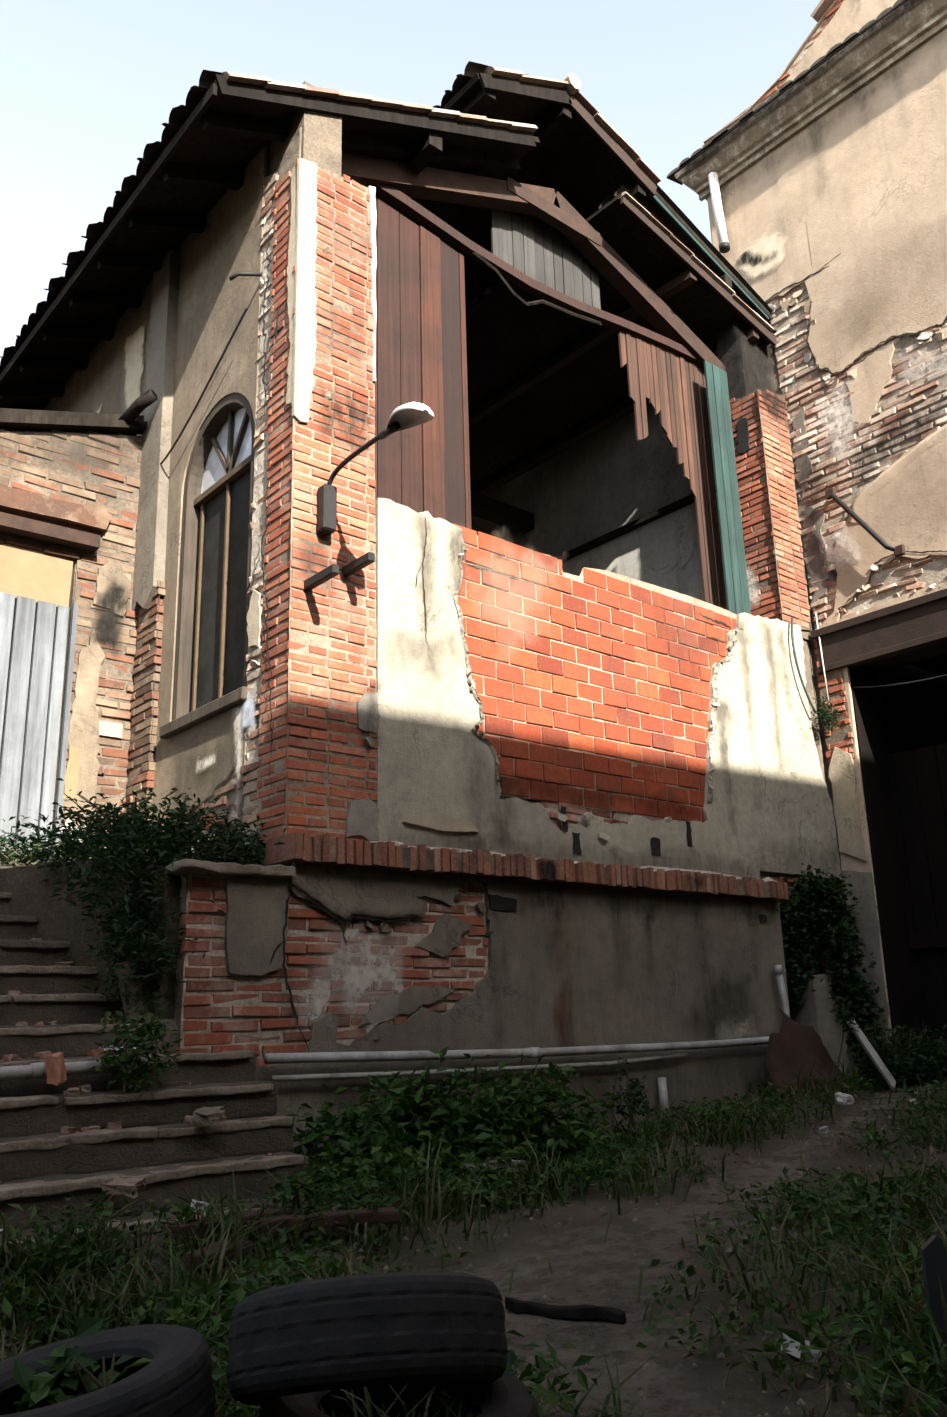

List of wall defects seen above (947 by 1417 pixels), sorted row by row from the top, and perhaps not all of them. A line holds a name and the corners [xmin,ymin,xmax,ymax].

crack [766,253,947,374]
damp [96,582,125,645]
flaking render [453,544,501,782]
flaking render [707,628,744,802]
flaking render [768,283,947,765]
flaking render [177,874,498,1066]
crack [269,867,427,1051]